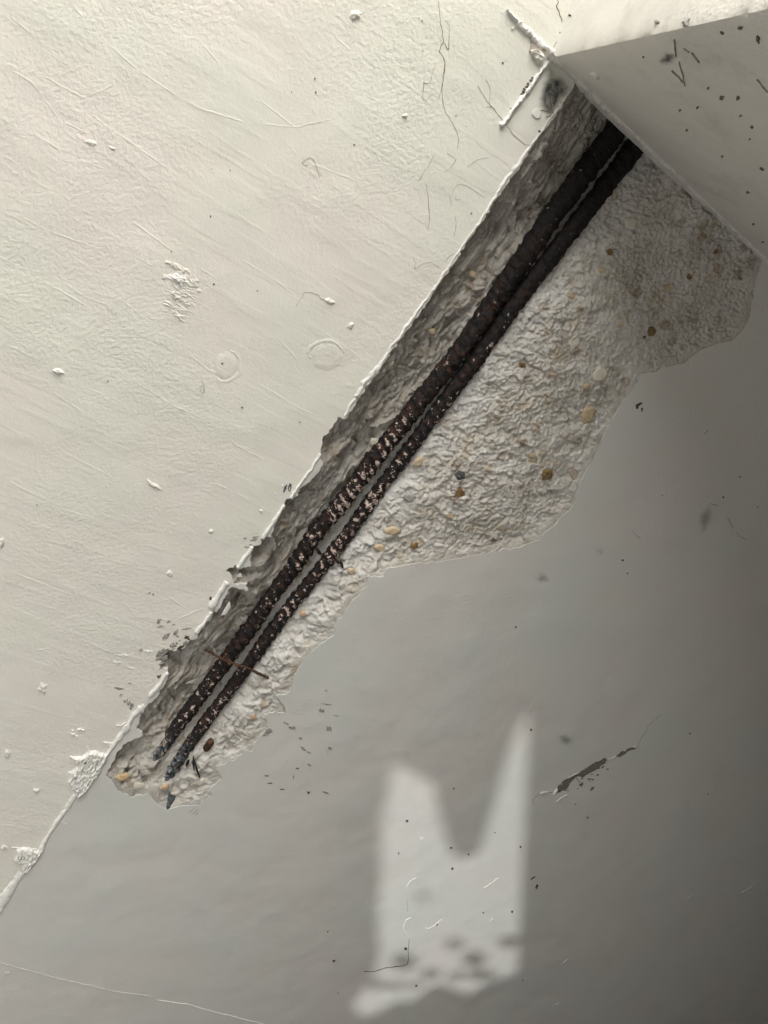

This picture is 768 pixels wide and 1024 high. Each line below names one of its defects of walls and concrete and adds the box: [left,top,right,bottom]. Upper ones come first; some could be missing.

spalling [107,84,762,808]